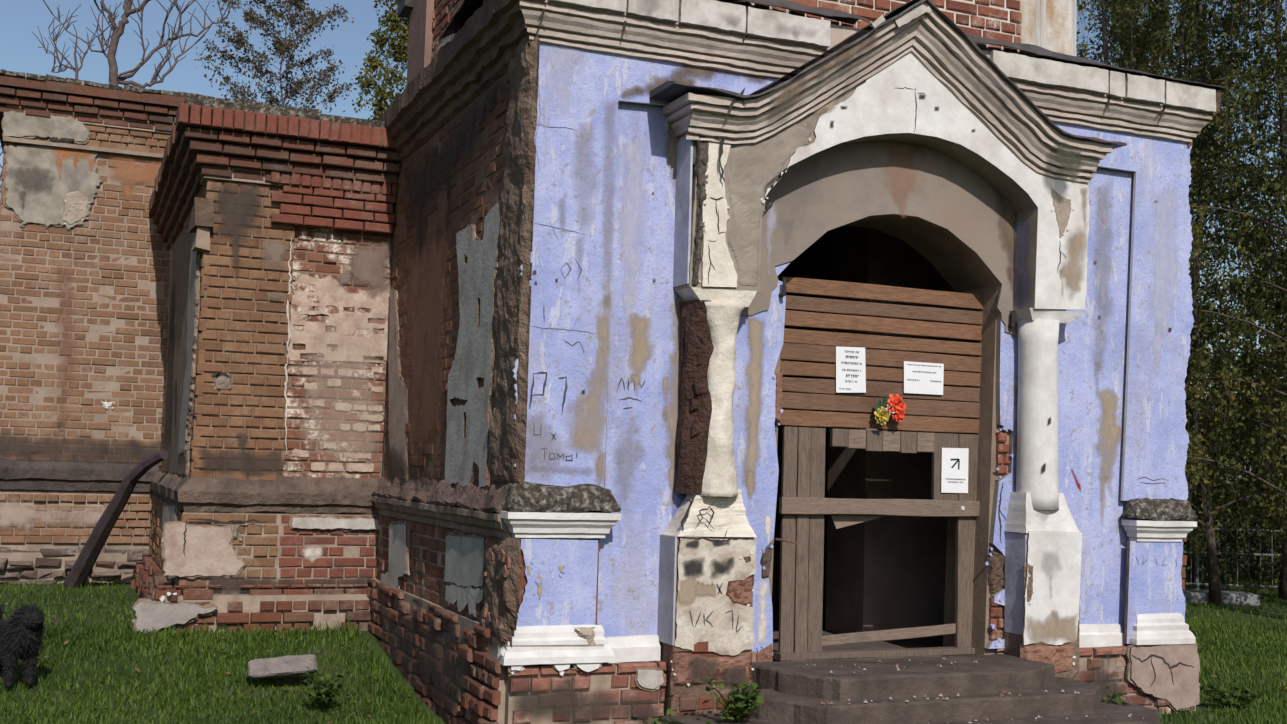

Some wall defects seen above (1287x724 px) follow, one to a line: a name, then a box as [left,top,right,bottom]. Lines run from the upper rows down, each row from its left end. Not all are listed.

peeling [1,111,103,231]
water stain [388,82,505,487]
spalling [445,26,540,490]
crack [694,88,746,281]
spalling [1051,187,1075,238]
water stain [0,289,177,463]
peeling [284,272,409,480]
peeling [132,503,246,634]
crack [1132,654,1194,687]